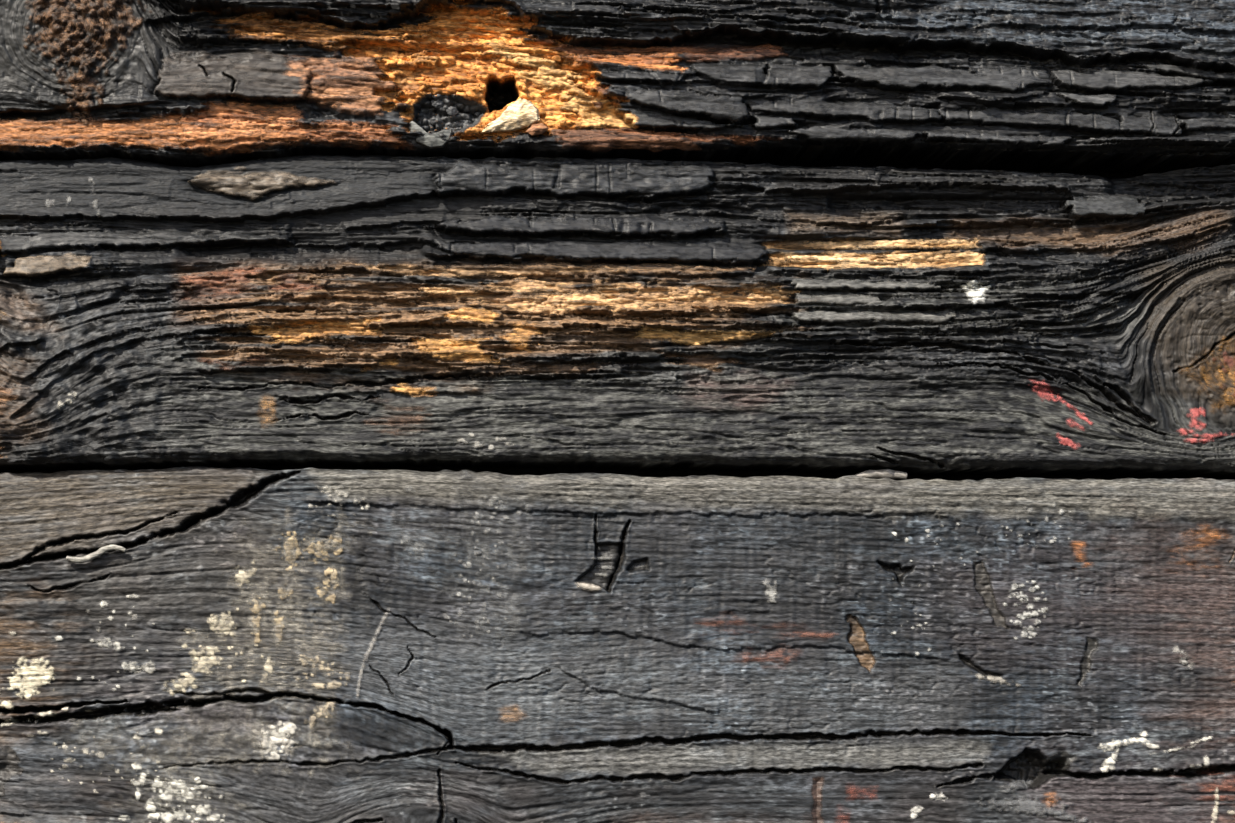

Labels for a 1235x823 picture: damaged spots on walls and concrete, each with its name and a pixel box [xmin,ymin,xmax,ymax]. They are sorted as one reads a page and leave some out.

spalling [0,2,1235,155]
peeling [368,239,983,361]
peeling [961,282,990,303]
peeling [248,318,381,344]
peeling [635,327,768,371]
peeling [392,384,434,396]
crack [0,471,300,592]
crack [0,601,1090,823]
crack [1055,765,1235,780]